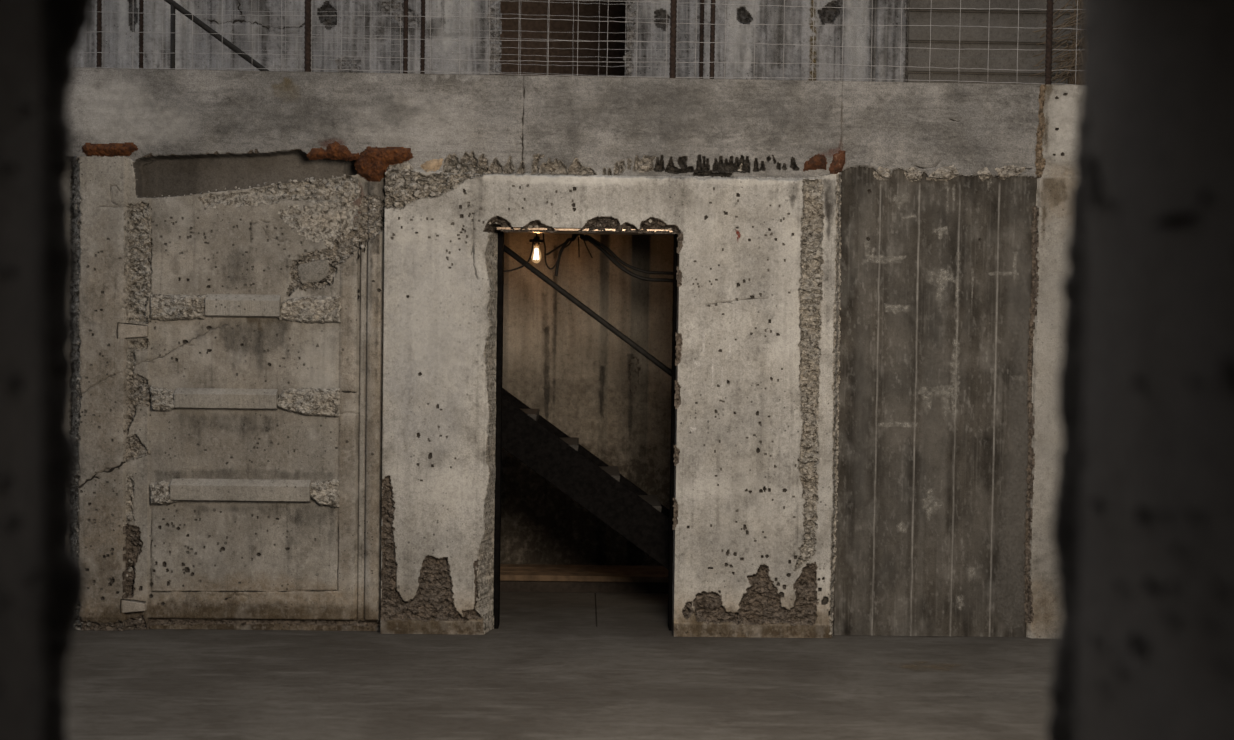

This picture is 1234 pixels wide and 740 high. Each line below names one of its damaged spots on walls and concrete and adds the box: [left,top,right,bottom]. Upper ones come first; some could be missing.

spalling [317,1,337,30]
spalling [737,7,753,25]
spalling [818,0,842,25]
corrosion [82,142,138,157]
corrosion [307,141,413,182]
corrosion [803,151,845,174]
crack [79,324,227,397]
spalling [69,151,842,635]
crack [78,461,126,488]